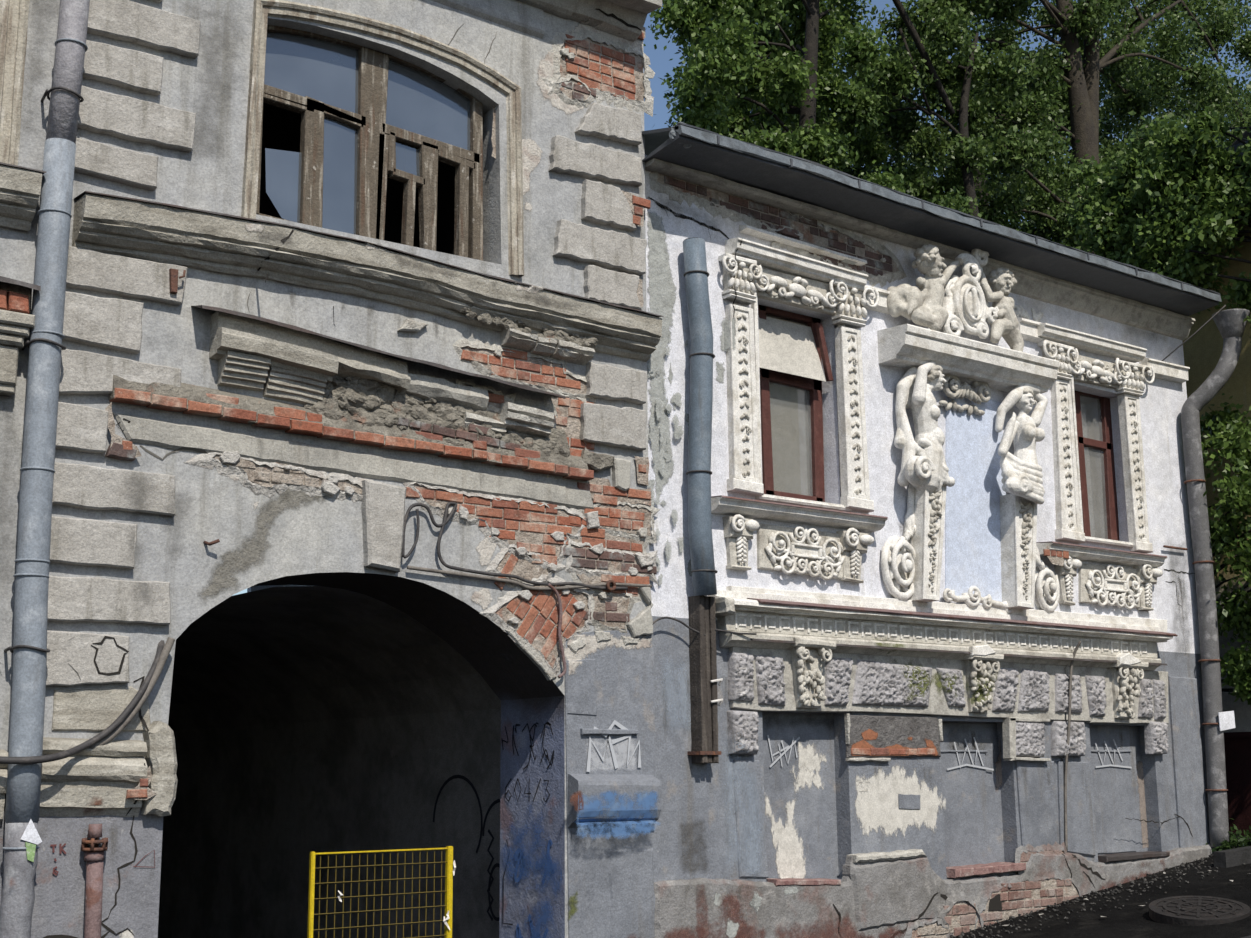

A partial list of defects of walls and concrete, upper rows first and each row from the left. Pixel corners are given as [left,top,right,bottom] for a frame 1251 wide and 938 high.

flaking render [537,18,655,117]
flaking render [109,171,907,681]
crack [68,636,150,766]
flaking render [844,713,943,762]
crack [43,800,138,938]
crack [892,892,948,938]
crack [1062,837,1105,887]